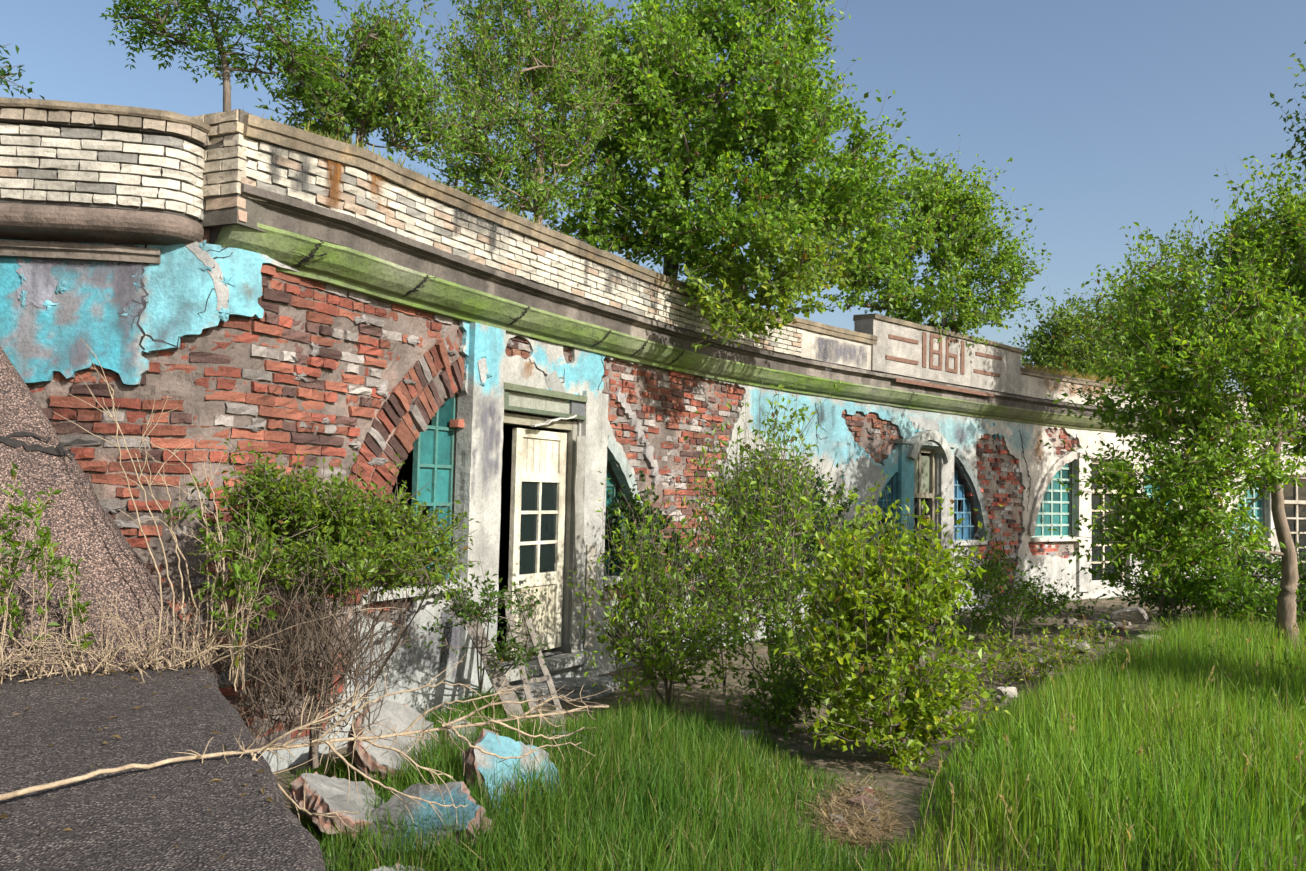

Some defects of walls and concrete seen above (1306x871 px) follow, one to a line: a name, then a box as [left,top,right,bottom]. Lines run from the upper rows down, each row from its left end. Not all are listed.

peeling [16,257,68,311]
crack [118,245,233,350]
crack [290,240,327,267]
spalling [505,336,537,359]
crack [0,431,99,457]
spalling [25,240,491,748]
spalling [601,357,745,598]
spalling [841,410,941,512]
spalling [961,422,1074,597]
spalling [1045,428,1080,457]